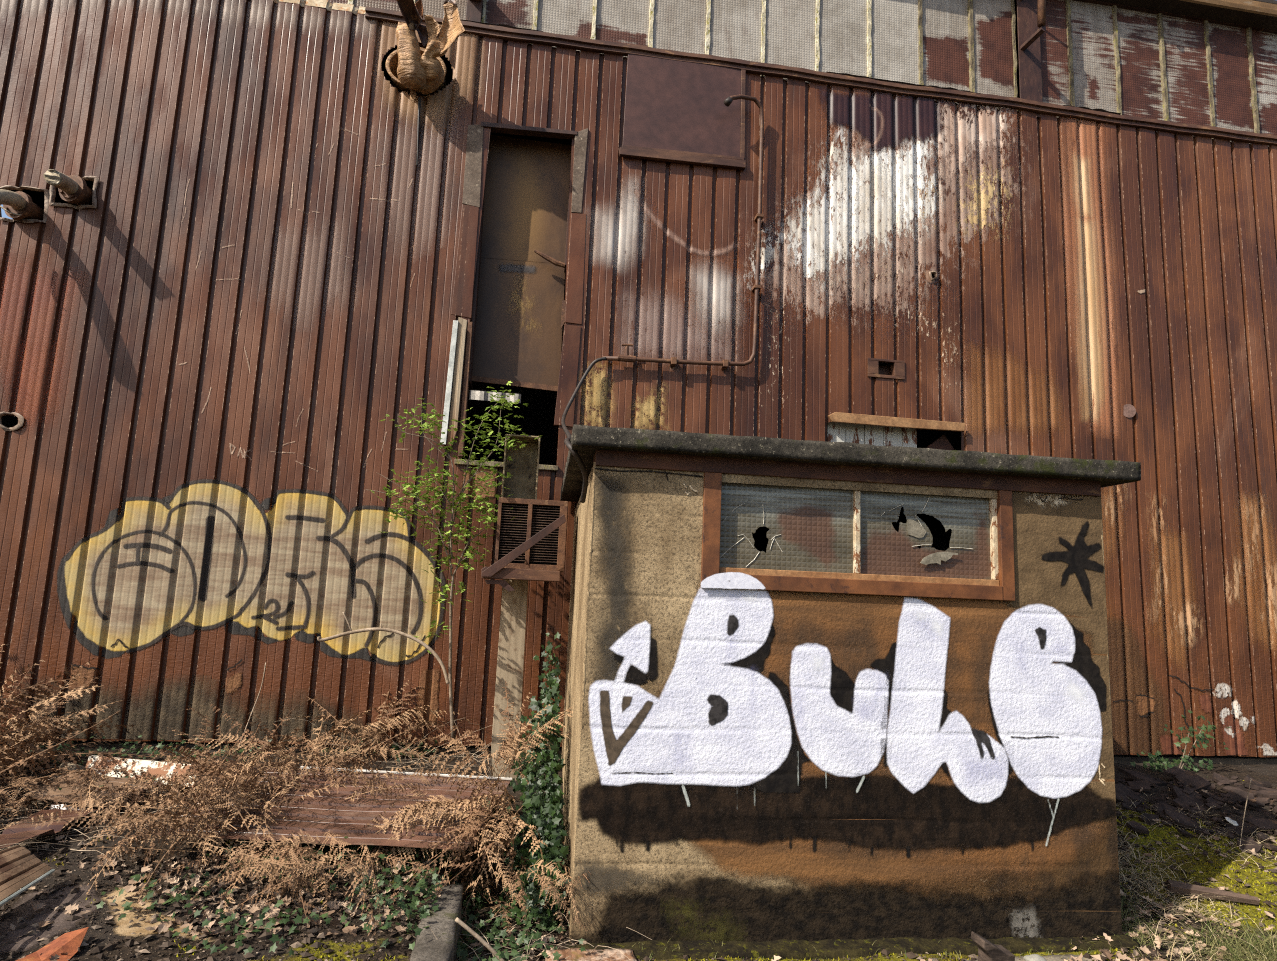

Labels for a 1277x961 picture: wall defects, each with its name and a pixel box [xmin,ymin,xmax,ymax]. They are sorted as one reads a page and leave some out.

peeling [750,104,1012,390]
peeling [1198,683,1277,755]